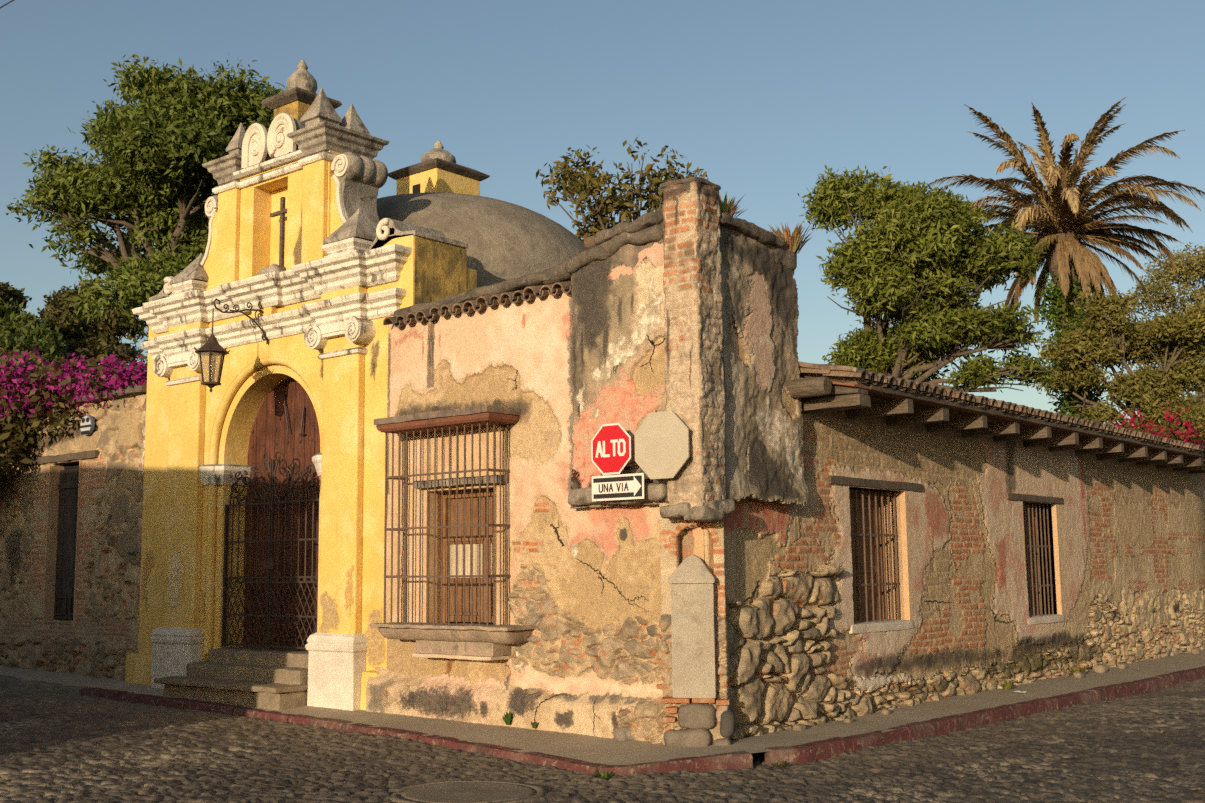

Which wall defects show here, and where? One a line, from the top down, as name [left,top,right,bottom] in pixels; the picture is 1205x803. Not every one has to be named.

peeling [571,281,666,488]
crack [550,520,647,612]
flaking render [903,482,987,661]
flaking render [824,634,864,676]
water stain [400,686,487,721]